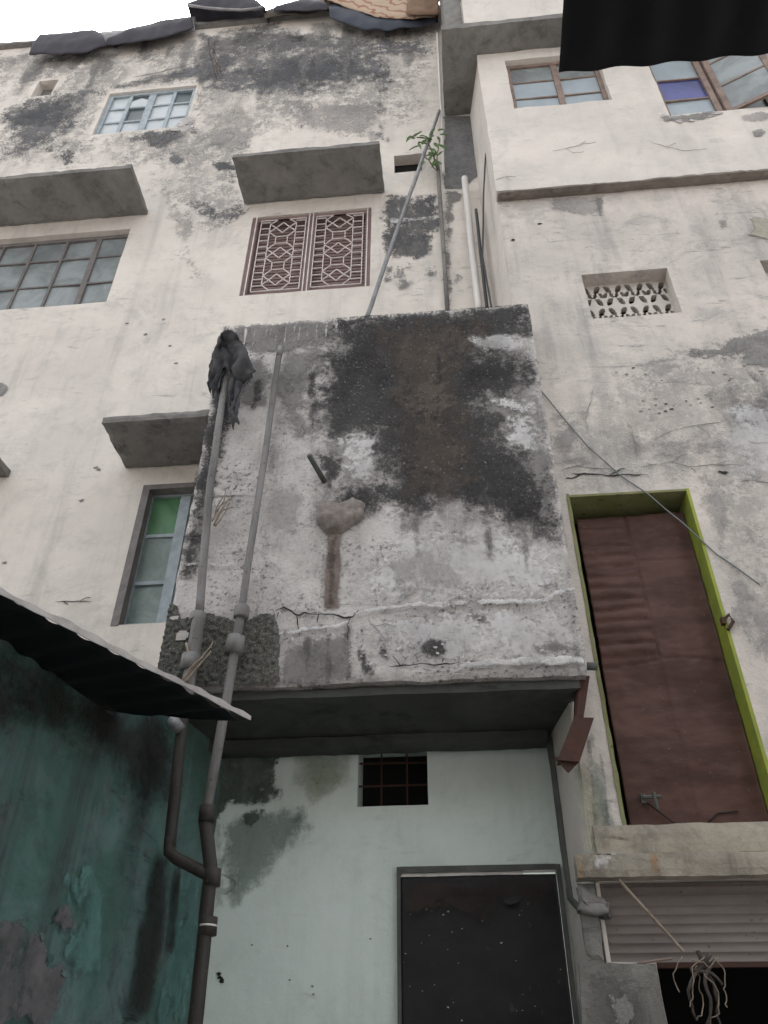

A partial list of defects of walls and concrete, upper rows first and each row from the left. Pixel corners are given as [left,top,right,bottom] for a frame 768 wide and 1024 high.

damp [0,22,433,165]
damp [130,110,260,183]
damp [176,191,577,596]
crack [563,421,768,483]
corrosion [321,534,341,608]
spalling [157,603,191,682]
spalling [195,609,280,686]
crack [275,607,458,667]
damp [243,809,265,827]
peeling [0,866,101,1024]